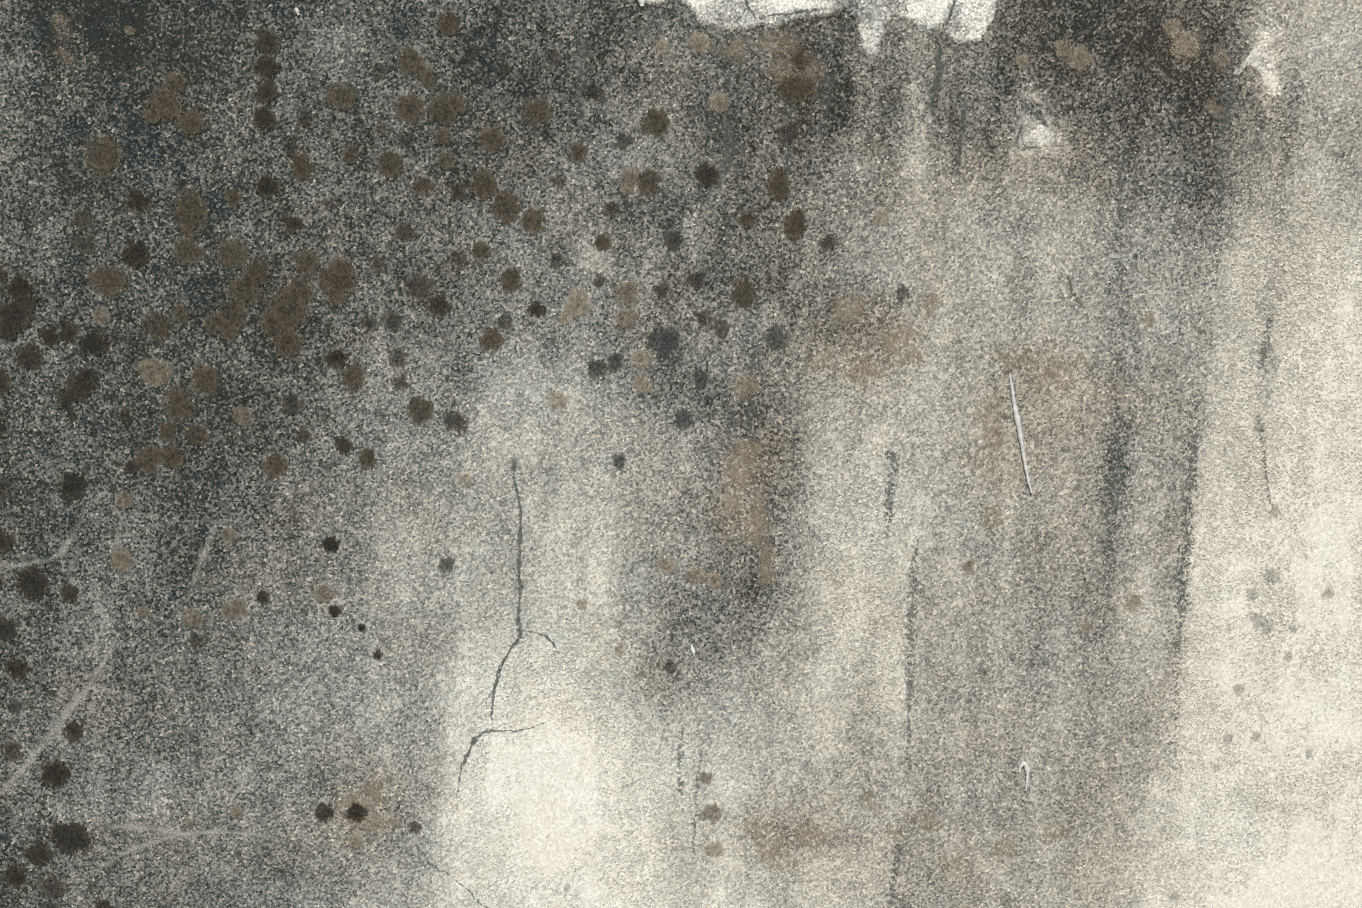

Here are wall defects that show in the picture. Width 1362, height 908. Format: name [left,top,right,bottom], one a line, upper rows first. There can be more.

flaking render [682,0,997,59]
water stain [325,28,546,235]
water stain [613,107,670,149]
water stain [0,265,111,422]
water stain [141,184,386,359]
water stain [388,348,469,433]
water stain [646,37,850,459]
crack [457,462,556,792]
water stain [815,452,917,749]
water stain [3,820,95,908]
water stain [314,802,368,822]
water stain [454,611,702,908]